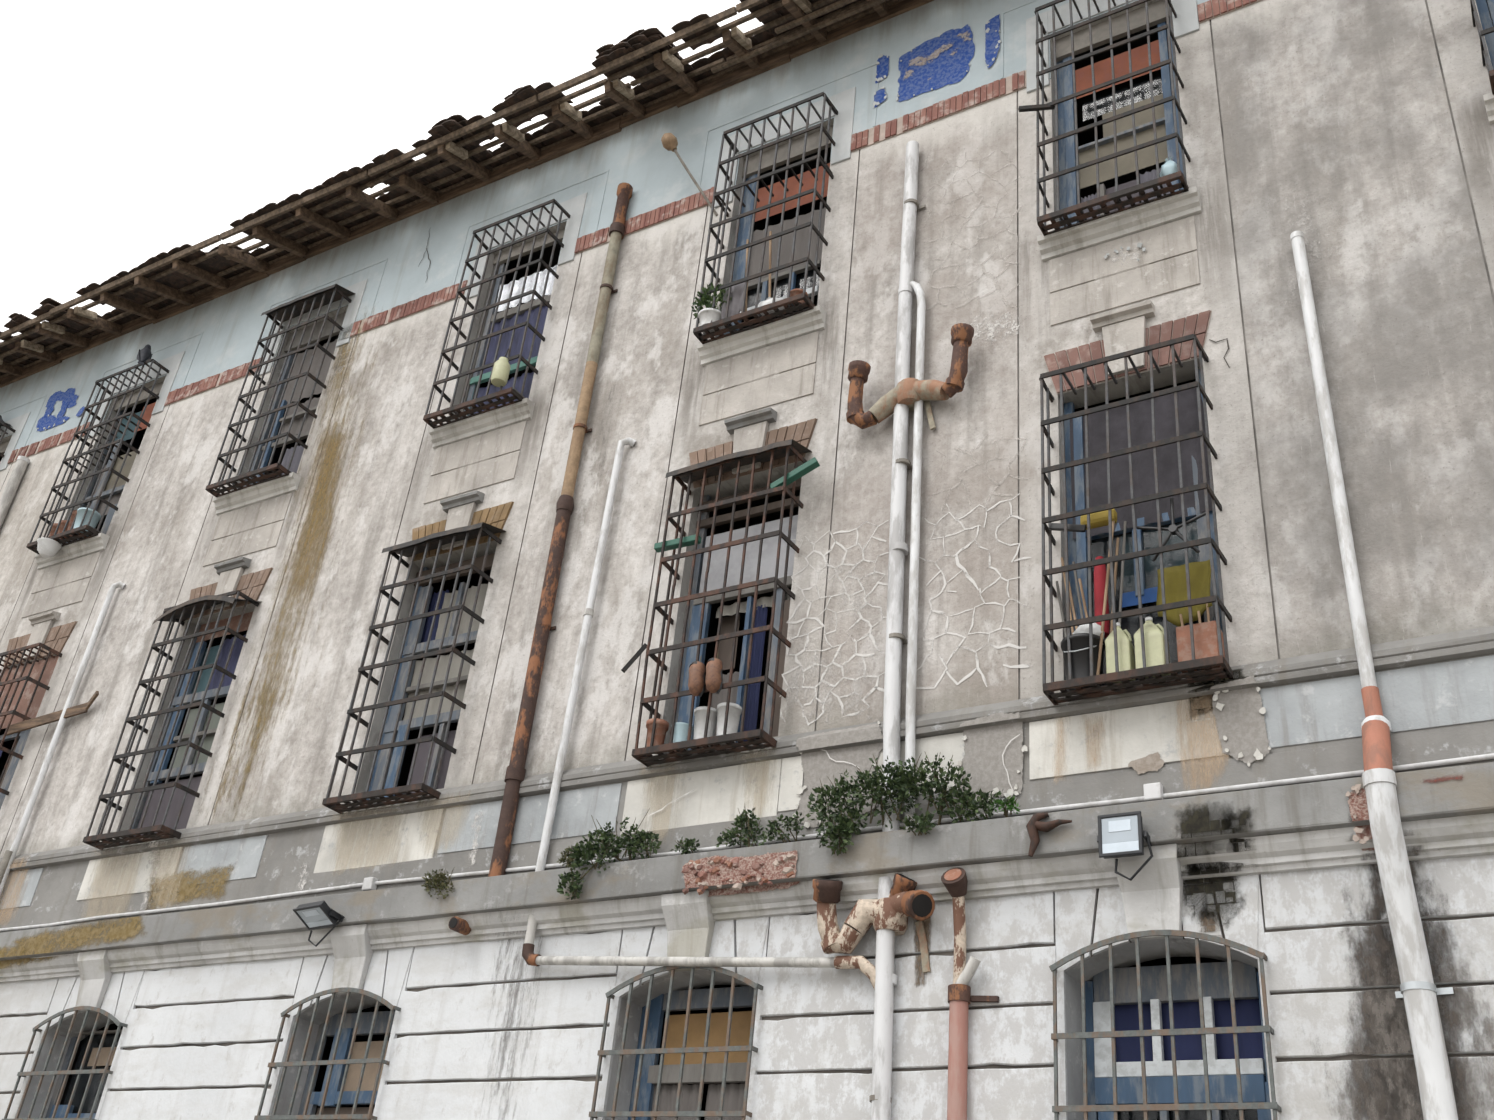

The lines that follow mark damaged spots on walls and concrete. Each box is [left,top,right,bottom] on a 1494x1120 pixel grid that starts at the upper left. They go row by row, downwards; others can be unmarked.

peeling [872,14,1002,108]
crack [922,151,1022,316]
water stain [216,329,360,803]
crack [779,434,1031,768]
crack [1002,734,1020,790]
peeling [1210,675,1271,767]
spalling [681,850,800,897]
water stain [1177,803,1253,936]
water stain [1338,859,1424,1120]
water stain [1408,835,1494,1120]